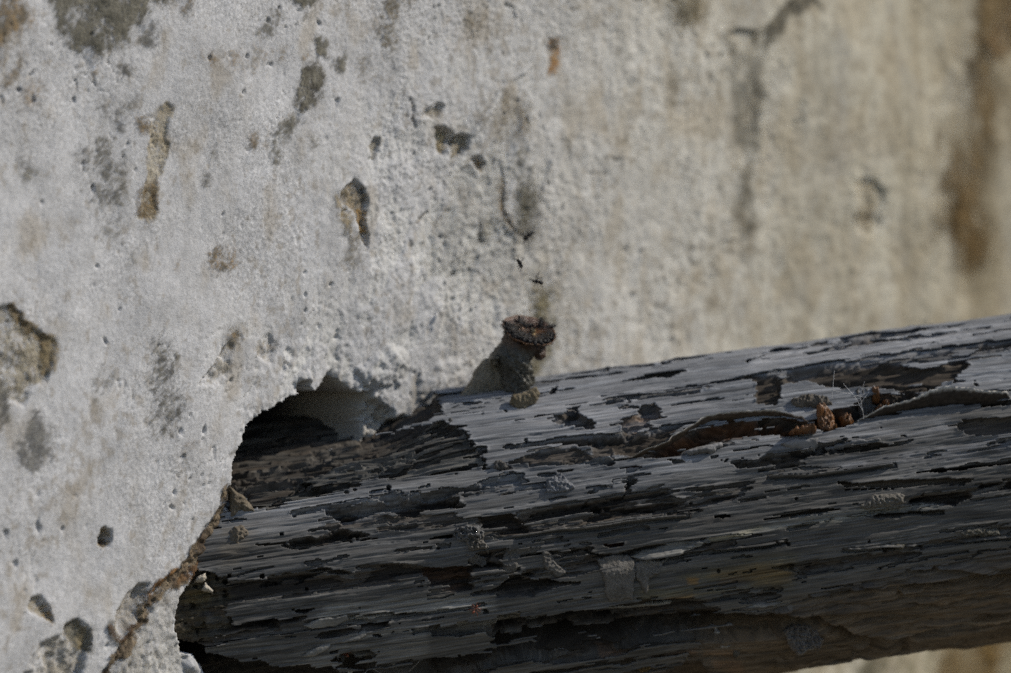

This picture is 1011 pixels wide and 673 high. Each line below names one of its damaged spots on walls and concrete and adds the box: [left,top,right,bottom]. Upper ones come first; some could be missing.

spalling [136,101,175,221]
spalling [335,182,367,237]
spalling [0,302,60,432]
spalling [28,597,53,623]
spalling [43,619,93,673]
spalling [107,584,146,645]
flaking render [117,604,188,673]
crack [103,484,230,673]
spalling [194,573,214,593]